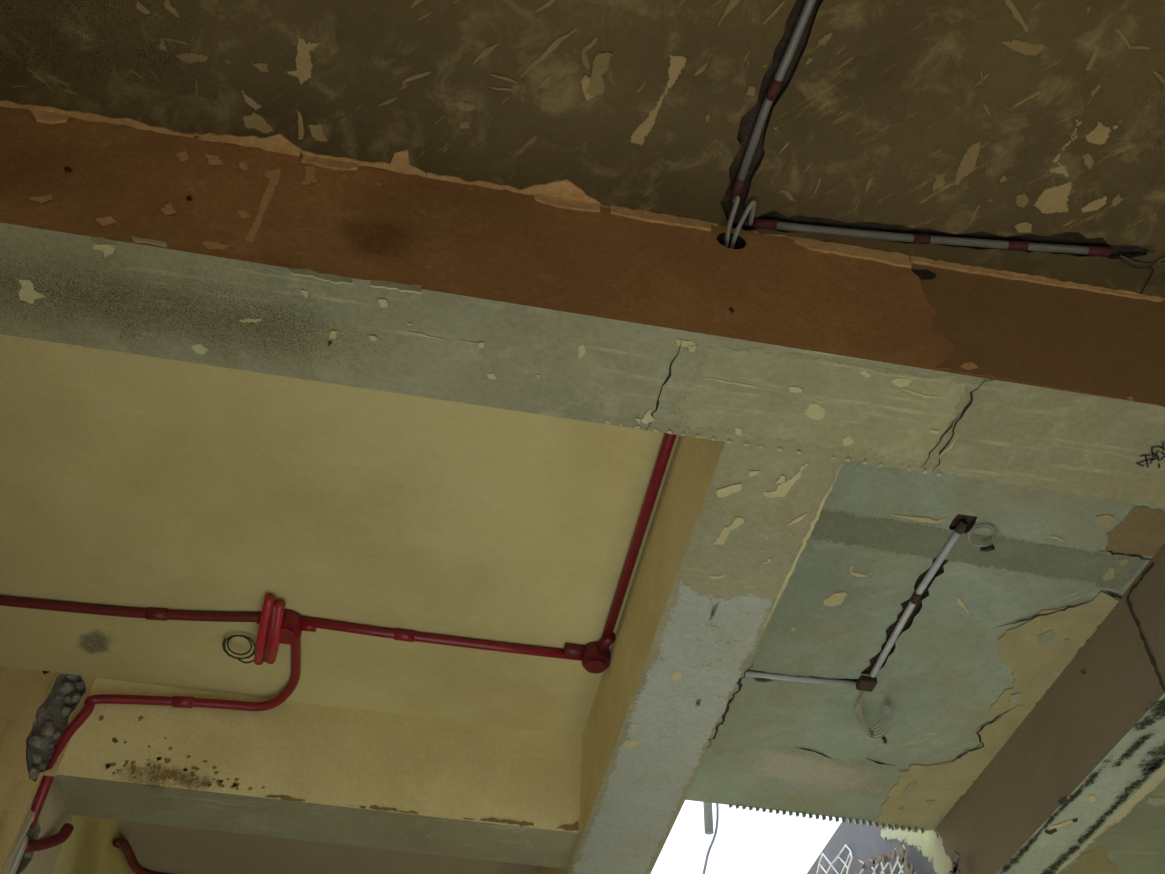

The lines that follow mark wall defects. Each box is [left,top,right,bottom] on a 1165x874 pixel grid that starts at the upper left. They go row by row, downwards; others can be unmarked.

peeling [242,91,273,133]
peeling [286,32,319,84]
peeling [297,111,328,143]
peeling [581,38,612,100]
peeling [630,55,687,145]
peeling [1016,120,1123,214]
leakage [0,208,429,386]
crack [646,341,682,430]
crack [923,376,991,471]
crack [706,664,753,749]
peeling [729,507,1165,835]
leakage [999,698,1165,874]